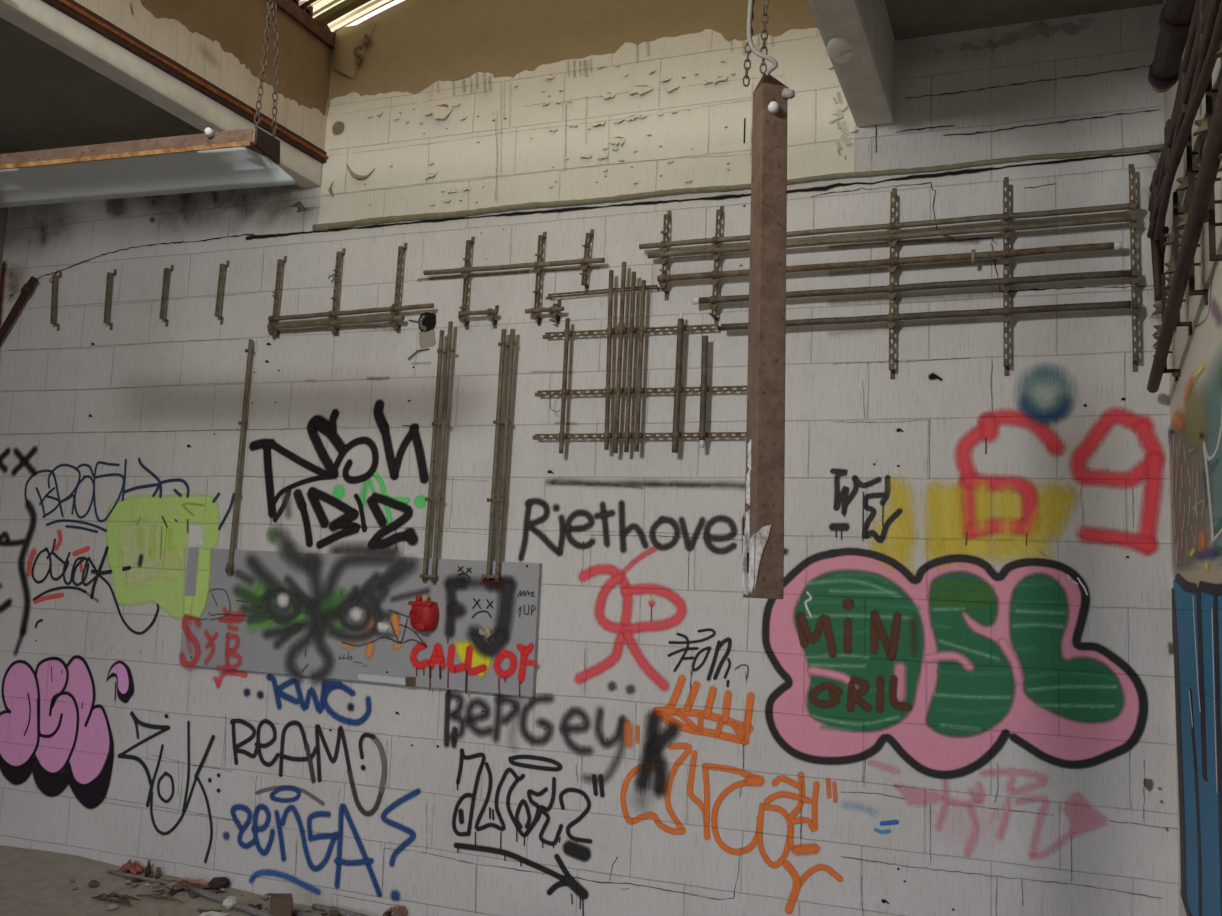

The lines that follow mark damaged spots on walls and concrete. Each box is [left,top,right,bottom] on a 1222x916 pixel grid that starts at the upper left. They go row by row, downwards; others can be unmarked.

peeling [74,0,858,224]
crack [875,109,1160,152]
crack [905,66,1150,99]
crack [37,193,751,283]
crack [787,150,1162,292]